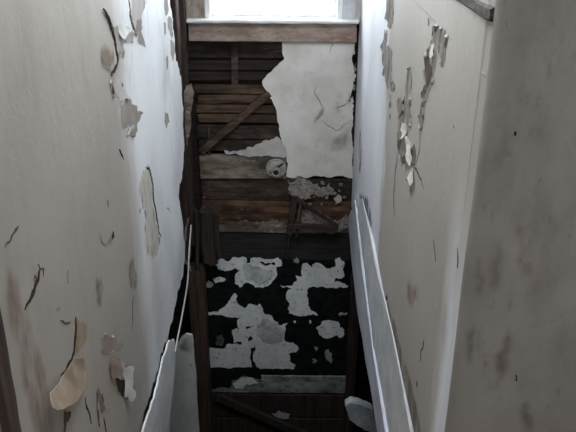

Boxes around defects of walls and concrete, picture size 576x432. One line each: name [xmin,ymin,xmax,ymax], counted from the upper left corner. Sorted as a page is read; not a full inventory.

peeling [114,0,146,60]
peeling [114,78,143,137]
crack [314,87,348,131]
peeling [380,0,448,196]
peeling [139,165,161,258]
spalling [288,176,349,234]
crack [25,264,44,310]
peeling [206,257,348,389]
peeling [50,319,109,432]
peeling [101,332,136,402]